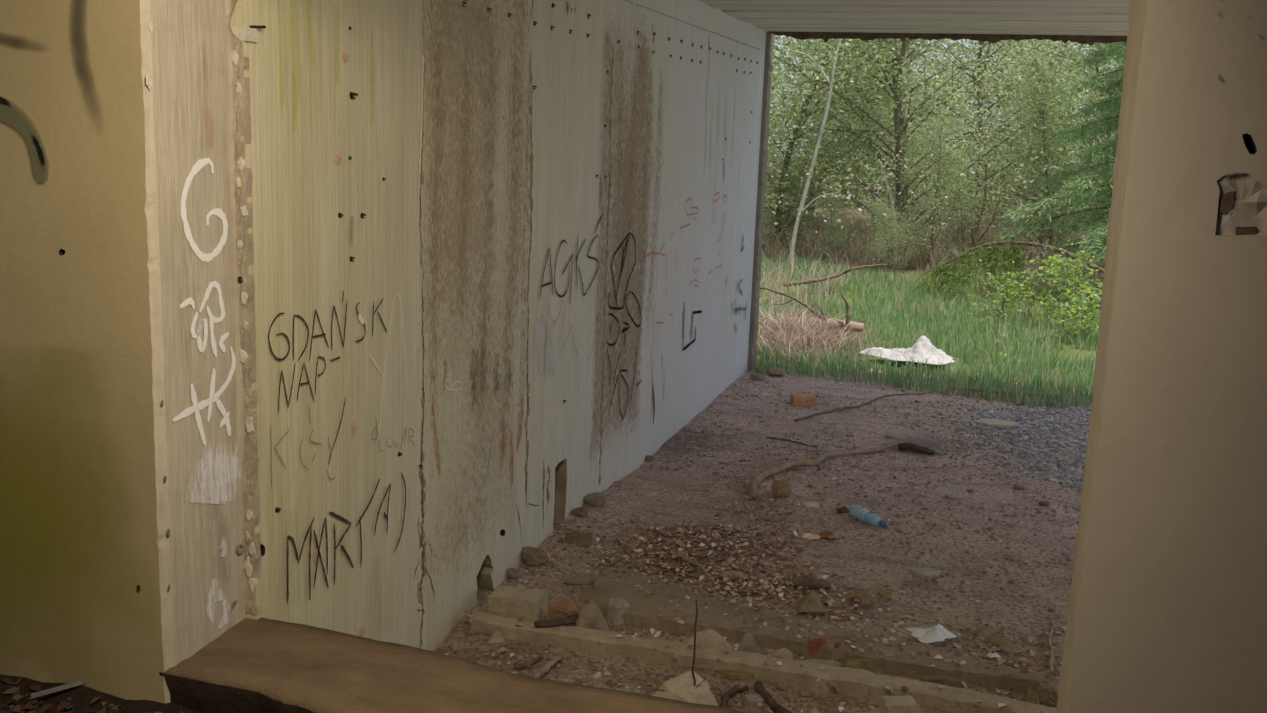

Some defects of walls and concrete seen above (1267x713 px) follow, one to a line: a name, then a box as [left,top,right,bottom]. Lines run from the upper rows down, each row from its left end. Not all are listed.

crack [415,48,435,645]
damp [458,45,547,431]